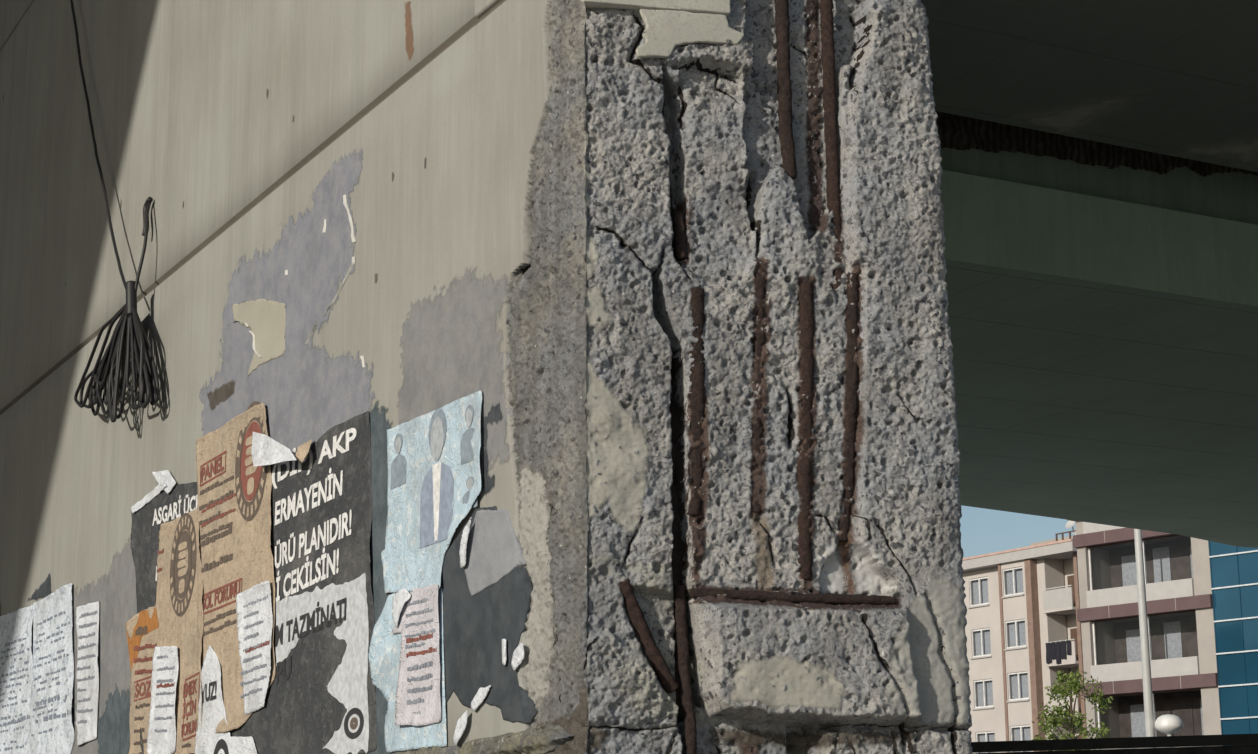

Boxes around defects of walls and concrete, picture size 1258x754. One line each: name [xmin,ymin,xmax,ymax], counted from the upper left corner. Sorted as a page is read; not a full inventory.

corrosion [405,2,414,60]
crack [629,14,743,130]
crack [849,15,872,94]
spalling [935,111,1258,176]
crack [594,226,692,299]
corrosion [670,199,691,265]
crack [745,178,761,254]
peeling [199,151,375,454]
corrosion [682,0,901,610]
spalling [397,0,970,754]
crack [816,515,966,754]
crack [581,725,675,754]